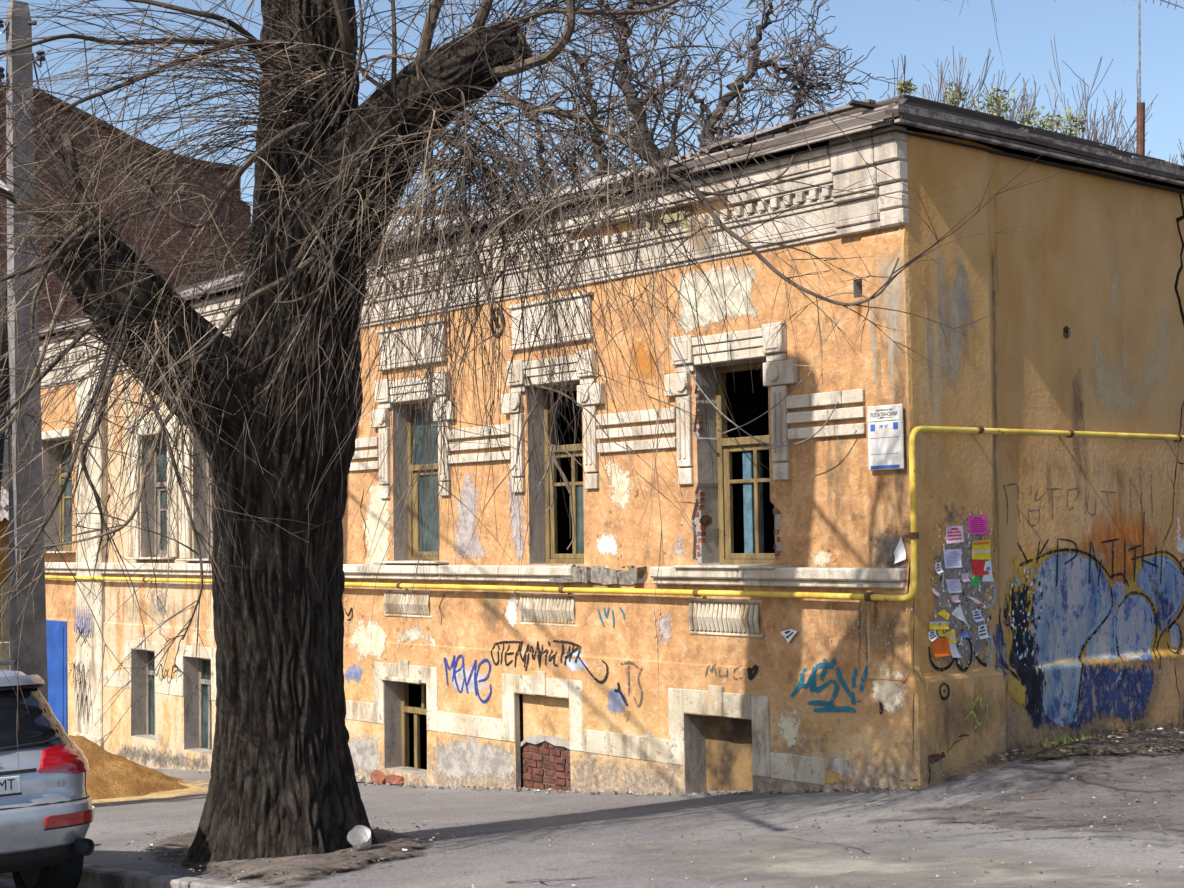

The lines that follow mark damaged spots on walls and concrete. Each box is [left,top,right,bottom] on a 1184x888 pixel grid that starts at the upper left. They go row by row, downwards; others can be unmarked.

peeling [671,257,756,337]
water stain [927,256,969,426]
peeling [454,473,488,565]
peeling [594,530,621,560]
peeling [604,459,638,515]
spalling [661,488,719,565]
spalling [773,505,783,560]
crack [1163,402,1184,545]
peeling [346,614,438,668]
peeling [862,663,912,721]